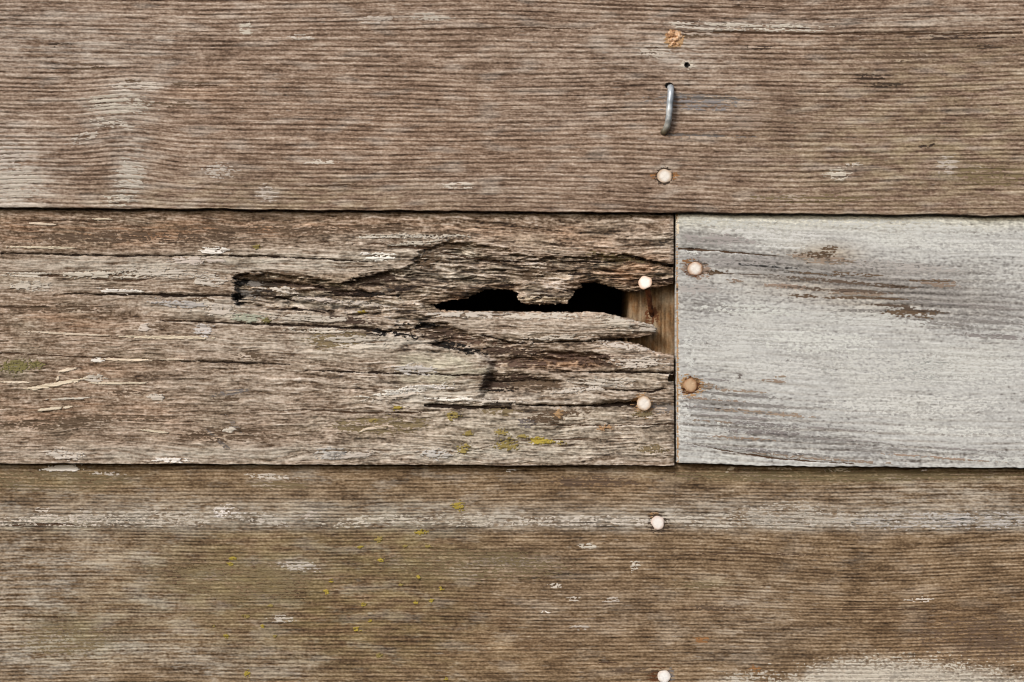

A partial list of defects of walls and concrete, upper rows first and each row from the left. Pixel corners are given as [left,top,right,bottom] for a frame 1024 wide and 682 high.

corrosion [664,29,713,48]
crack [1,243,776,331]